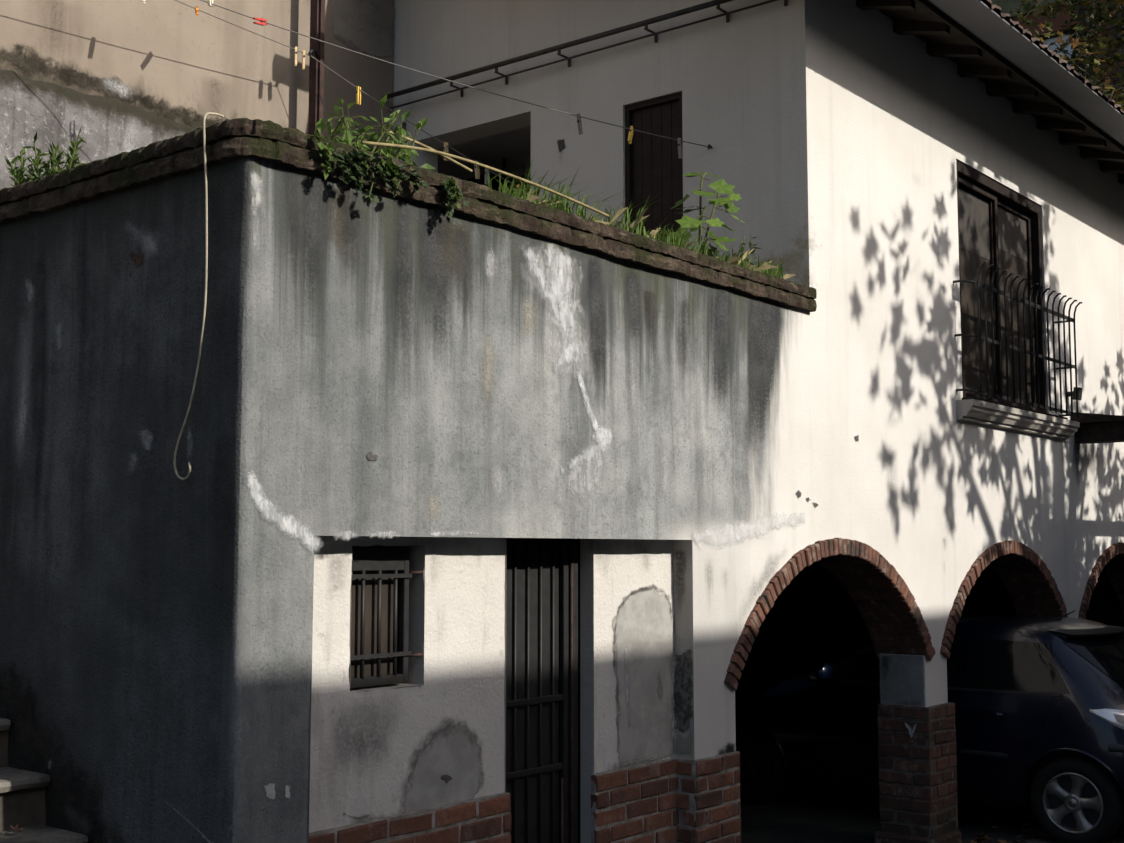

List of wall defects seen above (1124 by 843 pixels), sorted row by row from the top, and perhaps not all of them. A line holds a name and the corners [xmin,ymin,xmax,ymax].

leakage [19,264,45,484]
leakage [0,45,224,128]
leakage [123,124,137,152]
leakage [251,173,261,206]
leakage [287,168,357,290]
leakage [396,198,469,341]
leakage [589,260,606,378]
leakage [712,288,731,394]
leakage [749,297,782,428]
leakage [0,667,119,843]
spalling [658,649,693,754]